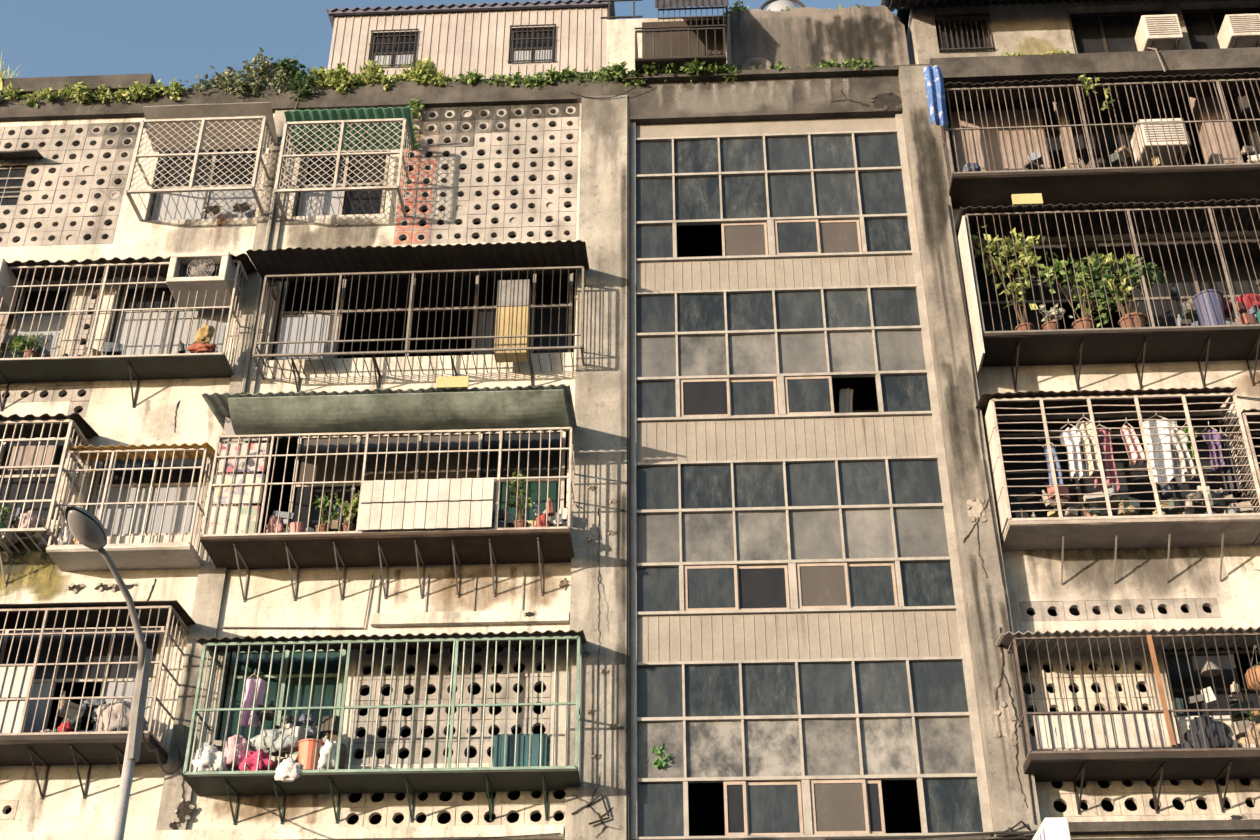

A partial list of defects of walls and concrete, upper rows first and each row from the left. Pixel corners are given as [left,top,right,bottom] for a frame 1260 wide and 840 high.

damp [741,15,899,65]
damp [0,541,48,574]
crack [571,772,620,838]